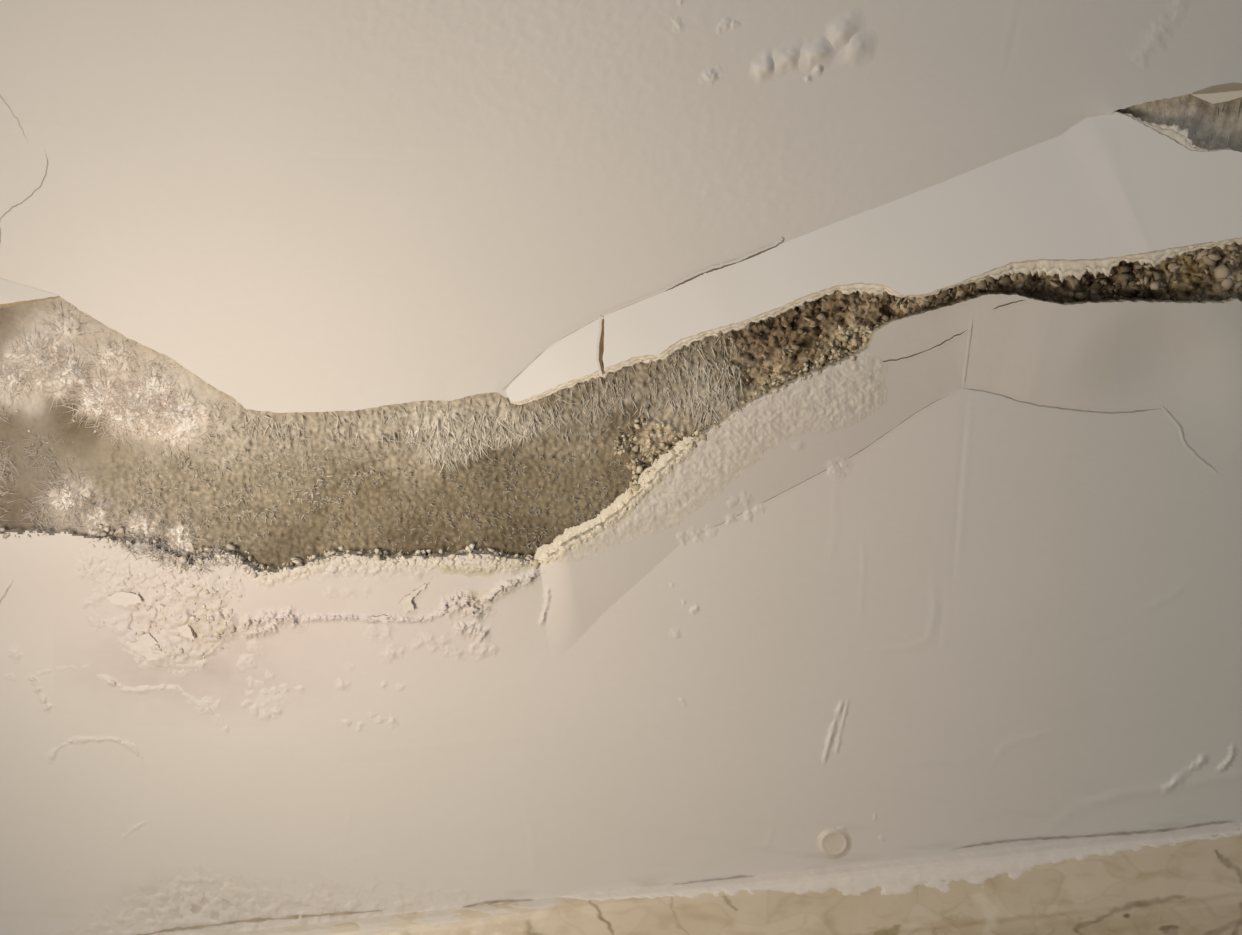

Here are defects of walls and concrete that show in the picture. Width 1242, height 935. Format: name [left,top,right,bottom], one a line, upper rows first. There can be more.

crack [0,95,48,243]
flaking render [0,83,1242,678]
crack [858,300,1218,475]